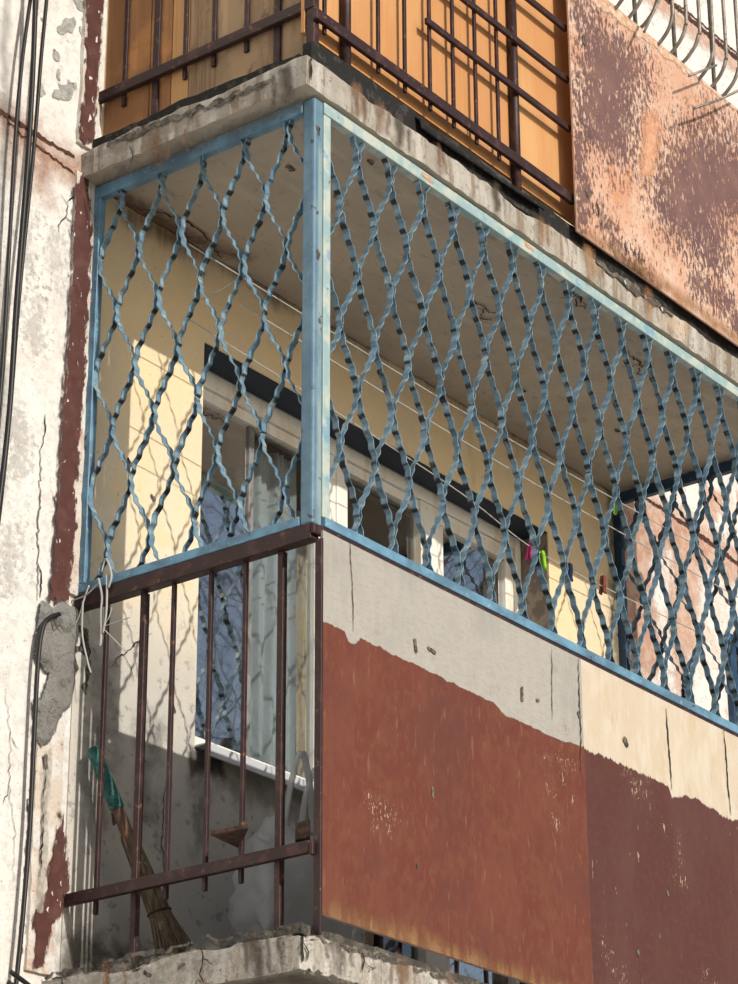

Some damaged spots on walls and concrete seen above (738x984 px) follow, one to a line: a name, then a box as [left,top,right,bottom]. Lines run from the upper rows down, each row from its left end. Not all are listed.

rust [648,0,737,69]
peeling [52,0,104,145]
spalling [106,79,271,147]
rust [639,107,662,181]
crack [36,413,46,600]
peeling [32,750,474,984]
crack [199,948,212,984]
rust [391,962,408,984]
rust [347,916,486,968]